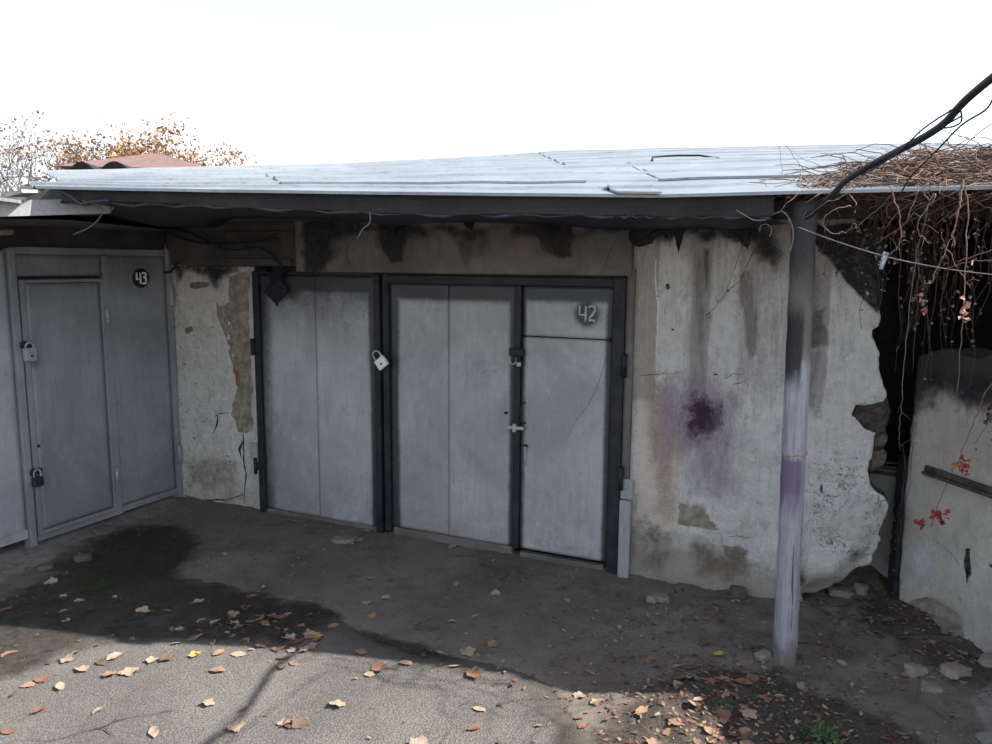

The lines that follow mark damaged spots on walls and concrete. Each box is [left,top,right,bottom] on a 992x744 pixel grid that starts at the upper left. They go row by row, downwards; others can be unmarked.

water stain [376,224,407,263]
water stain [530,224,571,258]
water stain [740,271,757,357]
spalling [212,272,252,436]
crack [184,434,247,503]
spalling [852,398,891,472]
peeling [677,503,721,531]
water stain [697,545,747,577]